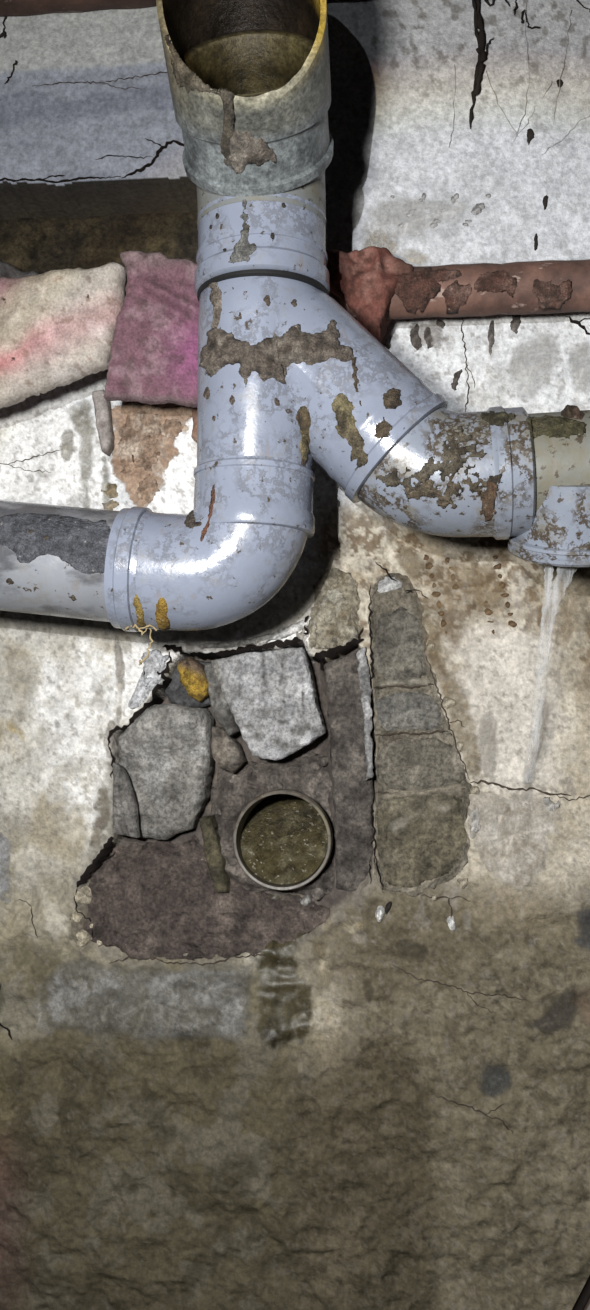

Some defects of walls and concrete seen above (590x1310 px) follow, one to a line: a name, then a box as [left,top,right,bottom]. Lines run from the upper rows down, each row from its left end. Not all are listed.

crack [0,138,184,183]
peeling [101,401,192,510]
spalling [368,573,480,922]
crack [426,659,590,801]
spalling [44,620,335,1040]
water stain [576,909,590,949]
water stain [534,989,590,1032]